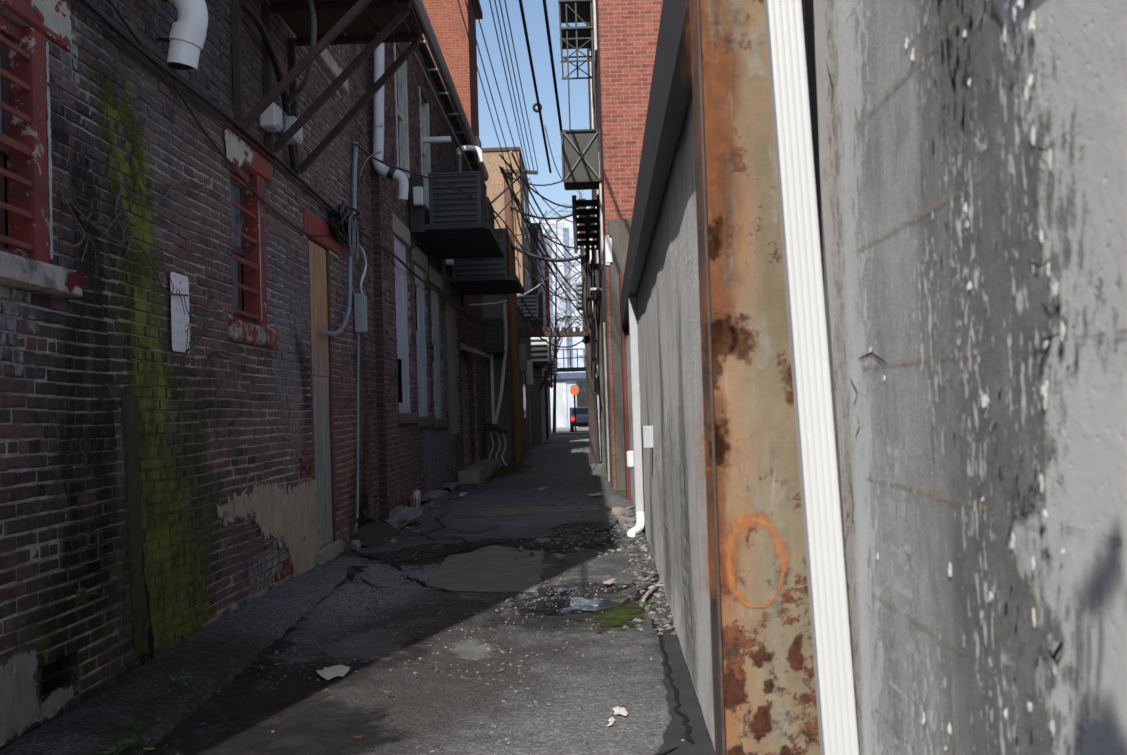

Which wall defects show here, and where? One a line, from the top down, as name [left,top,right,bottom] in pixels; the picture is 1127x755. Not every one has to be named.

peeling [224,128,254,168]
corrosion [695,0,752,591]
water stain [38,63,220,701]
corrosion [784,365,794,404]
peeling [820,0,1127,755]
peeling [217,449,320,582]
peeling [0,648,75,748]
corrosion [718,671,744,709]
corrosion [727,634,803,755]